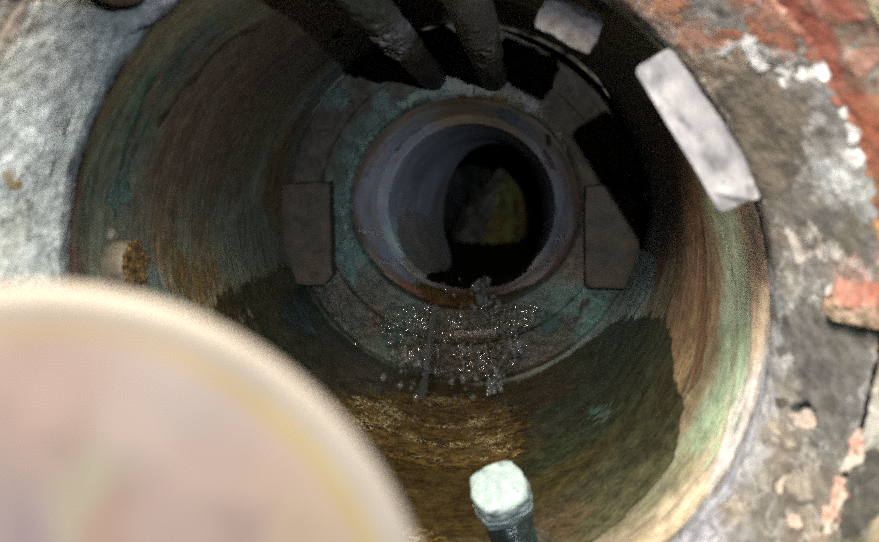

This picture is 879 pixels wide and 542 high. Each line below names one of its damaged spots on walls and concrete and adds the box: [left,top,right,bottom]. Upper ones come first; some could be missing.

corrosion [715,13,814,65]
leakage [713,35,879,282]
leakage [694,284,879,542]
crack [833,321,879,435]
peeling [817,429,865,539]